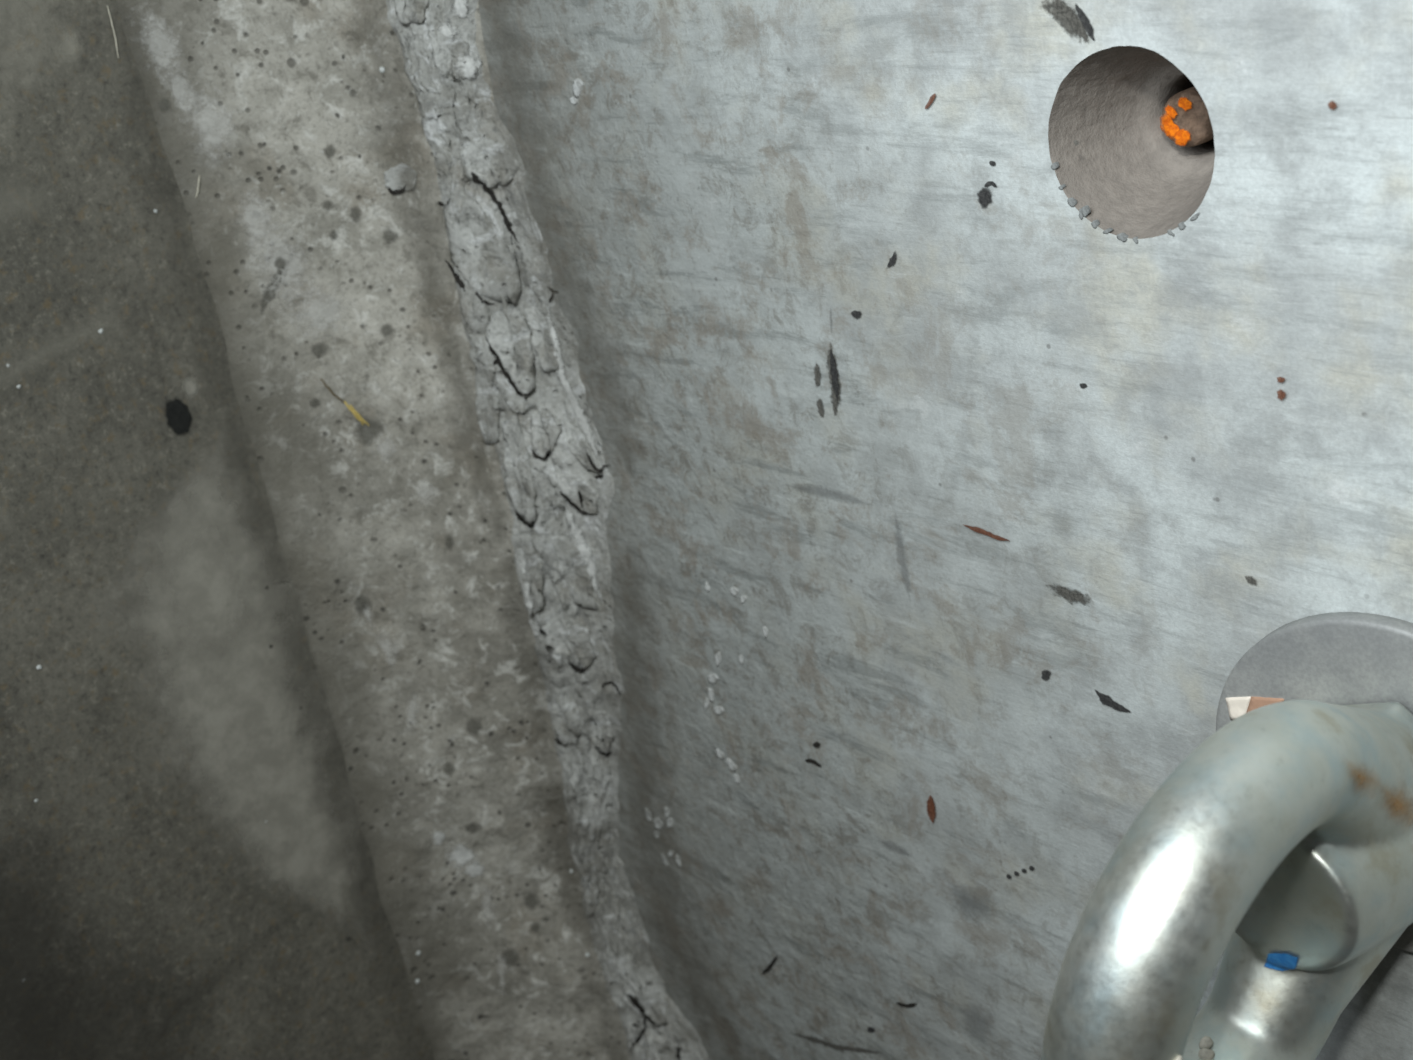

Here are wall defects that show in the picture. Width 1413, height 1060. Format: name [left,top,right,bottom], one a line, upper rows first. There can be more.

corrosion [1160,97,1192,146]
crack [388,186,405,195]
crack [471,172,519,244]
crack [445,260,534,396]
crack [531,448,550,461]
crack [560,450,609,515]
crack [515,510,534,528]
leakage [130,468,358,917]
crack [539,629,620,695]
crack [554,738,611,757]
crack [627,994,680,1060]